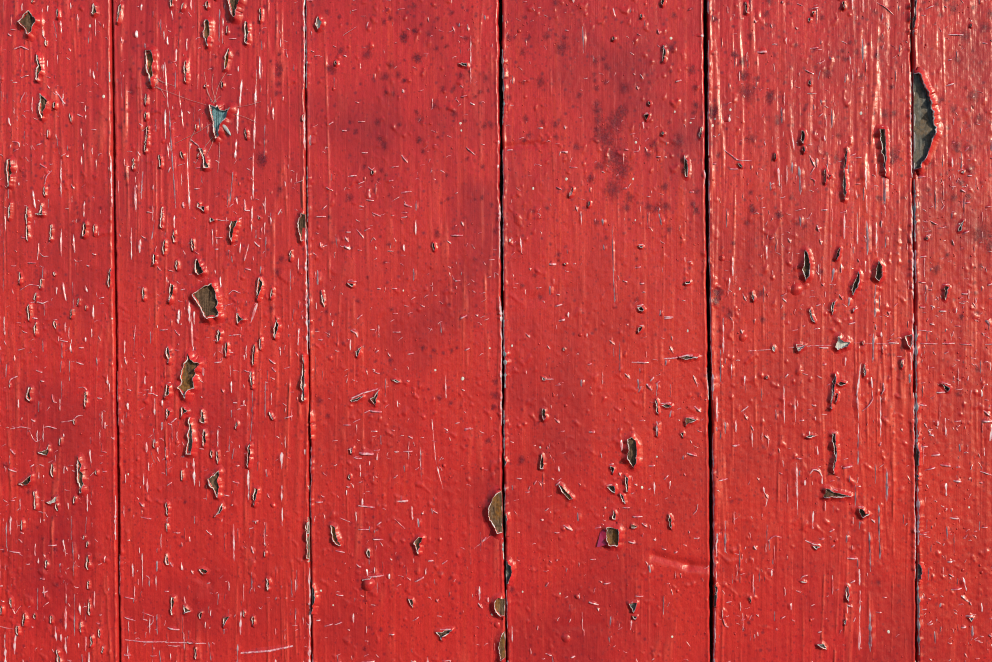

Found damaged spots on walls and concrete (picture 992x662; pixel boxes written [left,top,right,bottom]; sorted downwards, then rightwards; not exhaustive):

peeling [13,0,55,137]
peeling [199,0,261,87]
peeling [151,207,178,268]
peeling [166,239,248,356]
peeling [196,99,238,172]
peeling [195,199,242,246]
peeling [906,67,944,299]
peeling [162,343,226,519]
peeling [597,431,643,551]
peeling [482,484,517,662]